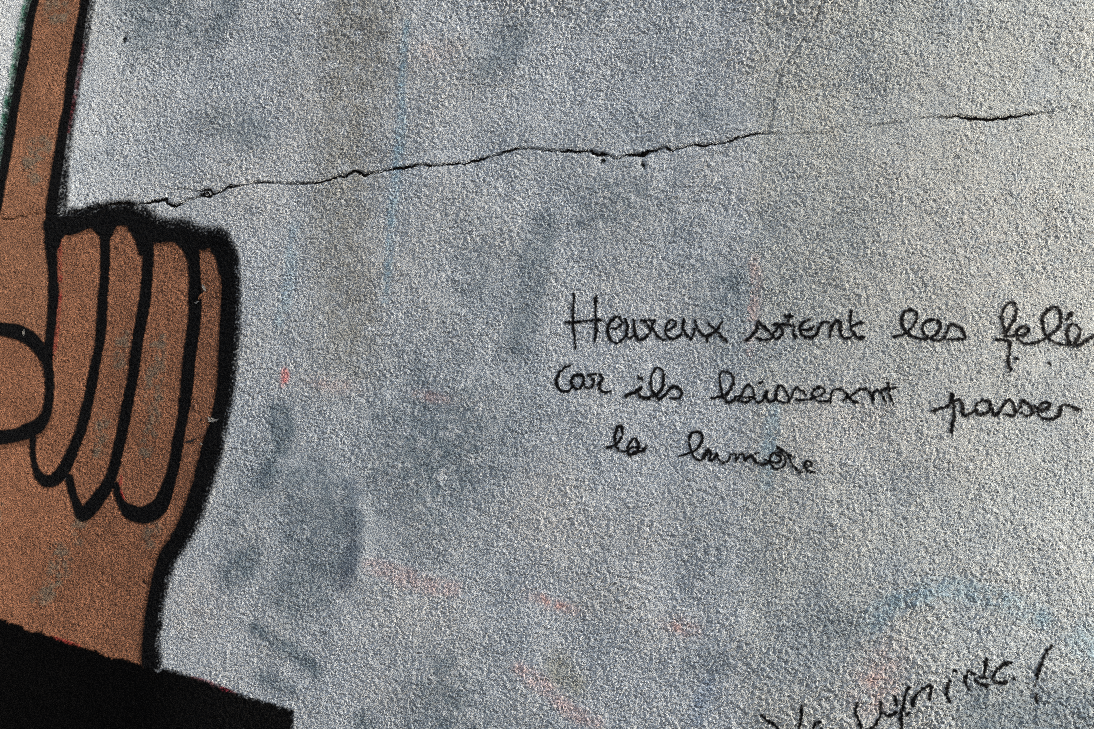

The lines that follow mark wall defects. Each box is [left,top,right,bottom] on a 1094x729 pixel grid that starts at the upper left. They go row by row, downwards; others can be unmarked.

crack [0,0,1090,220]